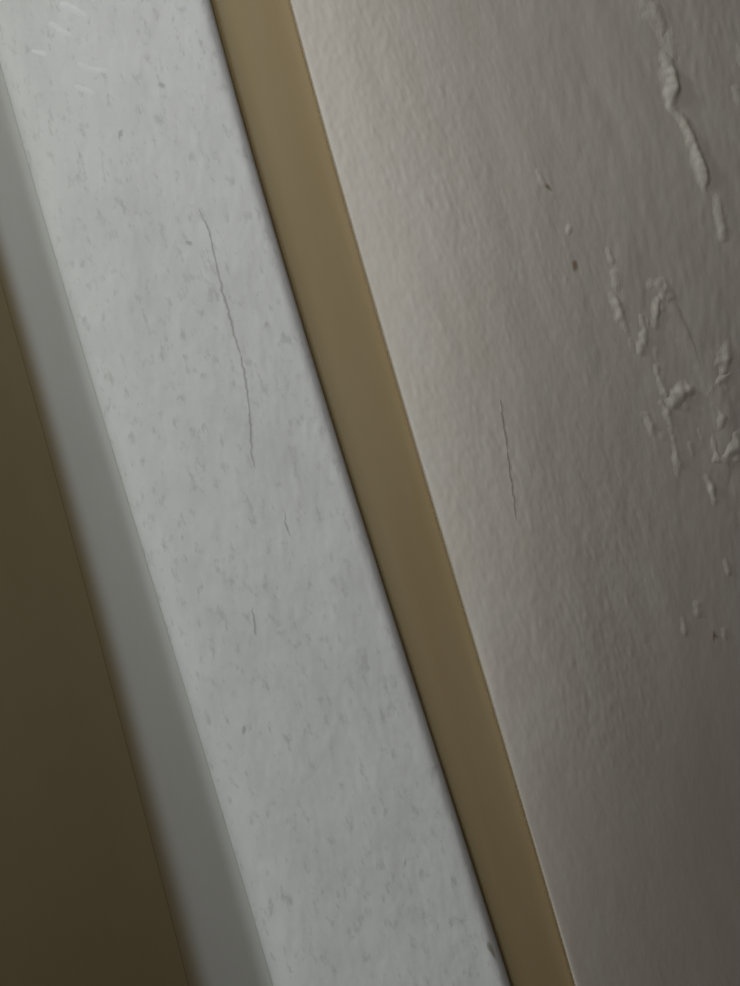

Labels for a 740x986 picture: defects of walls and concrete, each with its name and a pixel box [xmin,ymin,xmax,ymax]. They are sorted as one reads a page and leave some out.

peeling [632,0,730,245]
crack [199,210,255,468]